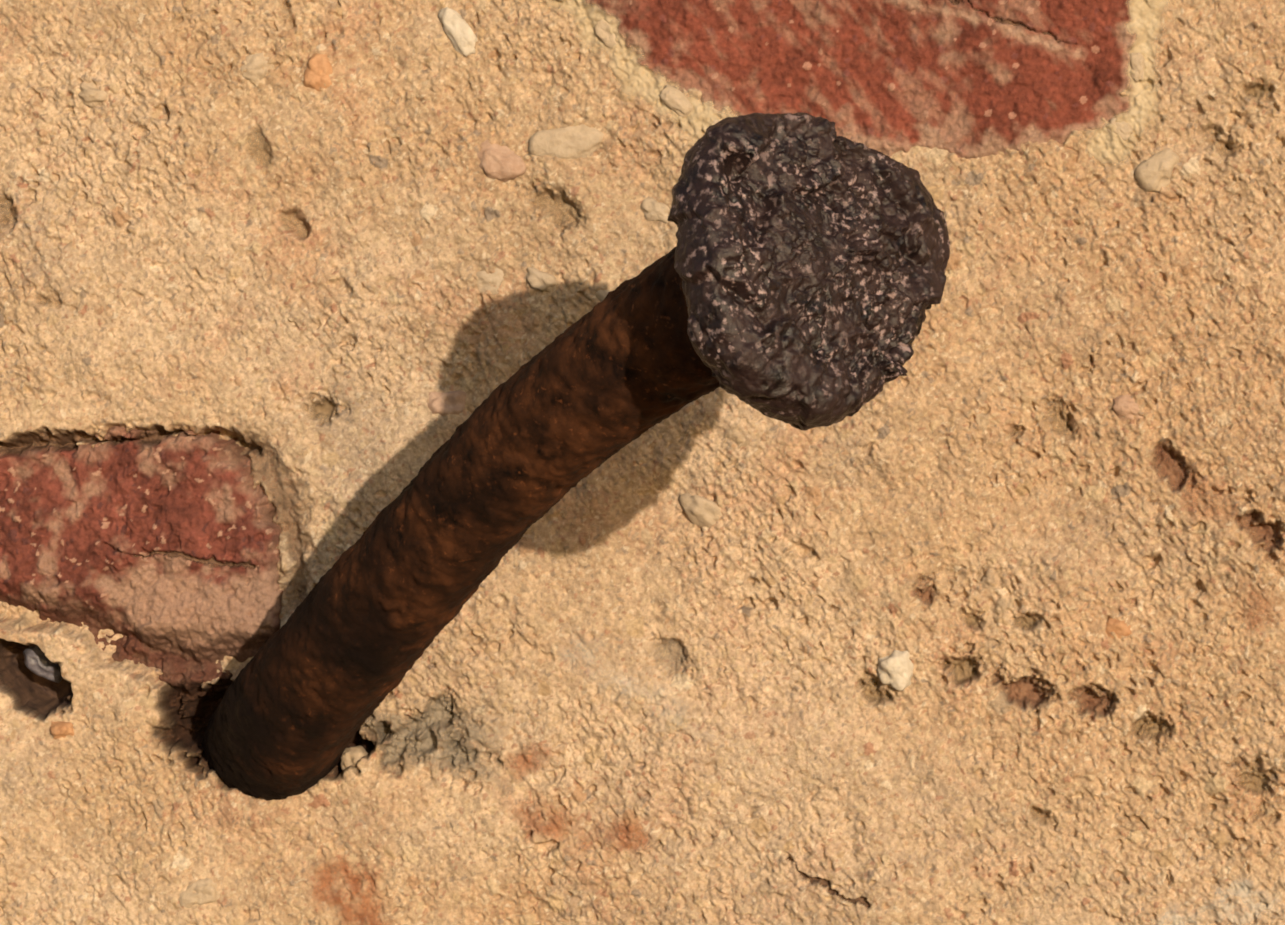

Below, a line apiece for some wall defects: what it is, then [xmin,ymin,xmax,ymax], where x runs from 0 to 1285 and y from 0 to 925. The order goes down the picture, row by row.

crack [949,0,1076,45]